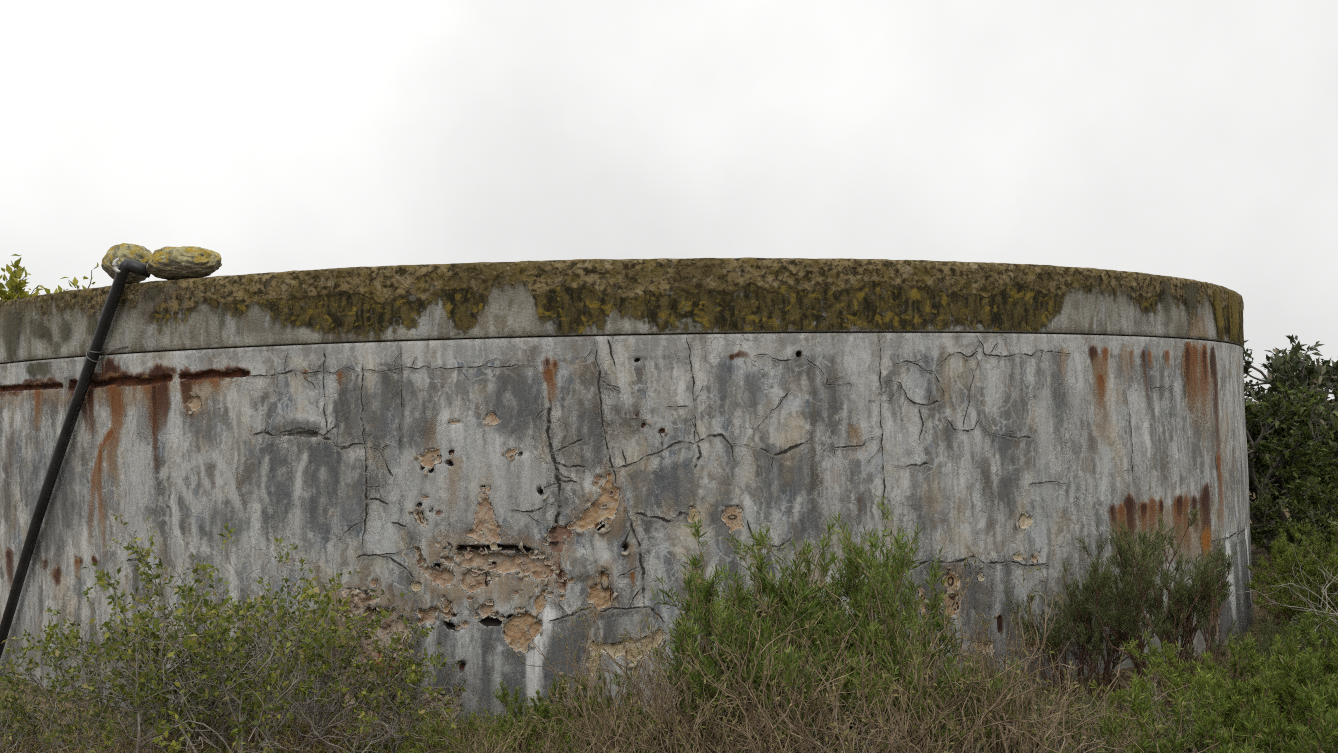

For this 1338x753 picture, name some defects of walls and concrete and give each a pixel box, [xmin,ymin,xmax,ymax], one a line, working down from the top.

rust [0,358,250,528]
water stain [173,410,368,552]
spalling [414,447,454,478]
water stain [340,376,541,530]
rust [533,355,558,395]
crack [249,335,1071,623]
rust [1089,345,1109,402]
rust [1110,342,1224,559]
spalling [323,472,620,724]
water stain [402,605,582,727]
peeling [586,564,667,691]
water stain [1214,499,1254,637]